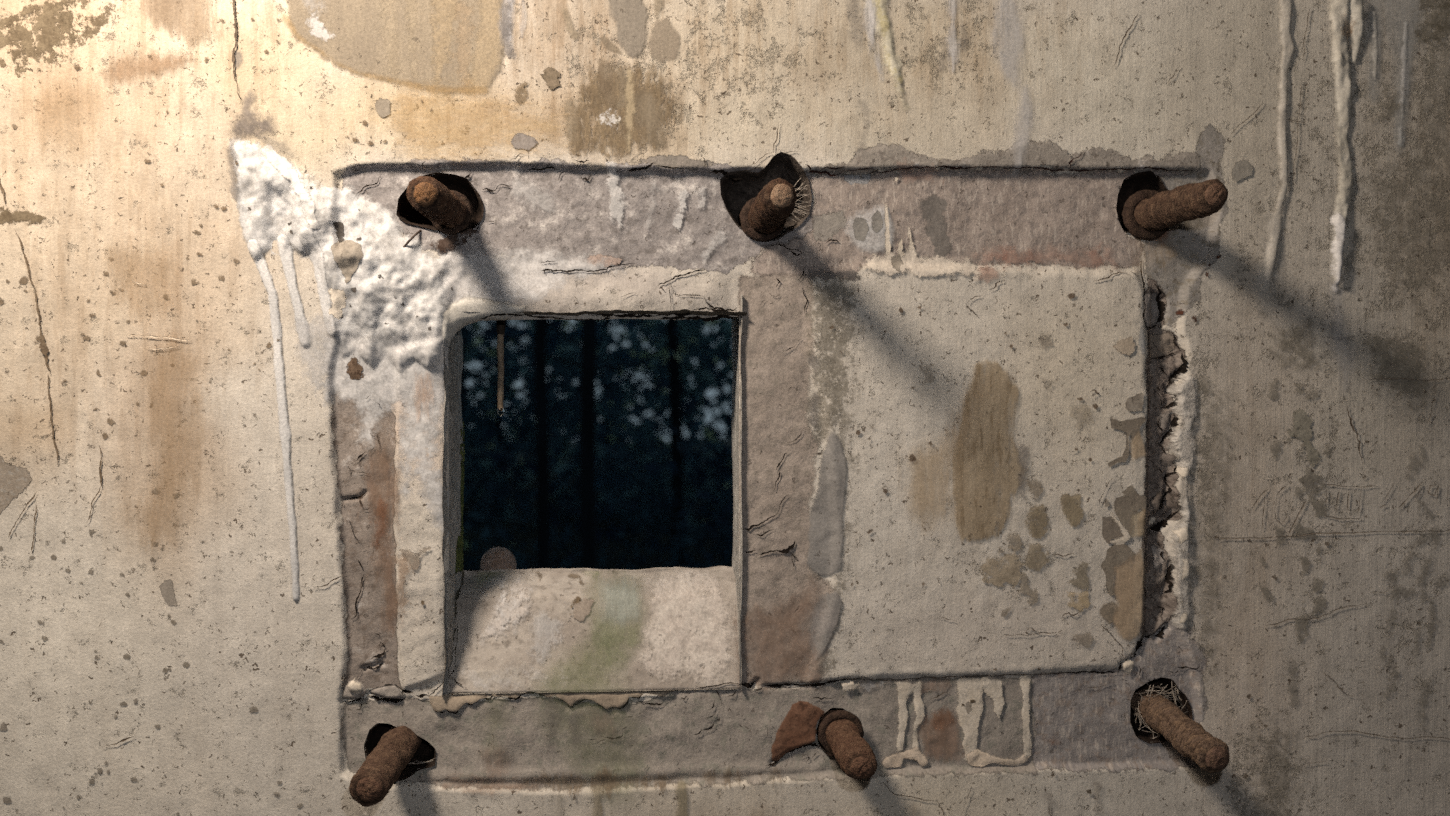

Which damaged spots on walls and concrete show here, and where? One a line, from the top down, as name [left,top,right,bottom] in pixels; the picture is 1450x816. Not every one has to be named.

peeling [347,98,397,145]
crack [463,124,1193,232]
damp [1264,0,1295,292]
damp [229,93,617,601]
peeling [0,455,32,514]
spalling [328,124,1253,800]
rust [771,701,825,761]